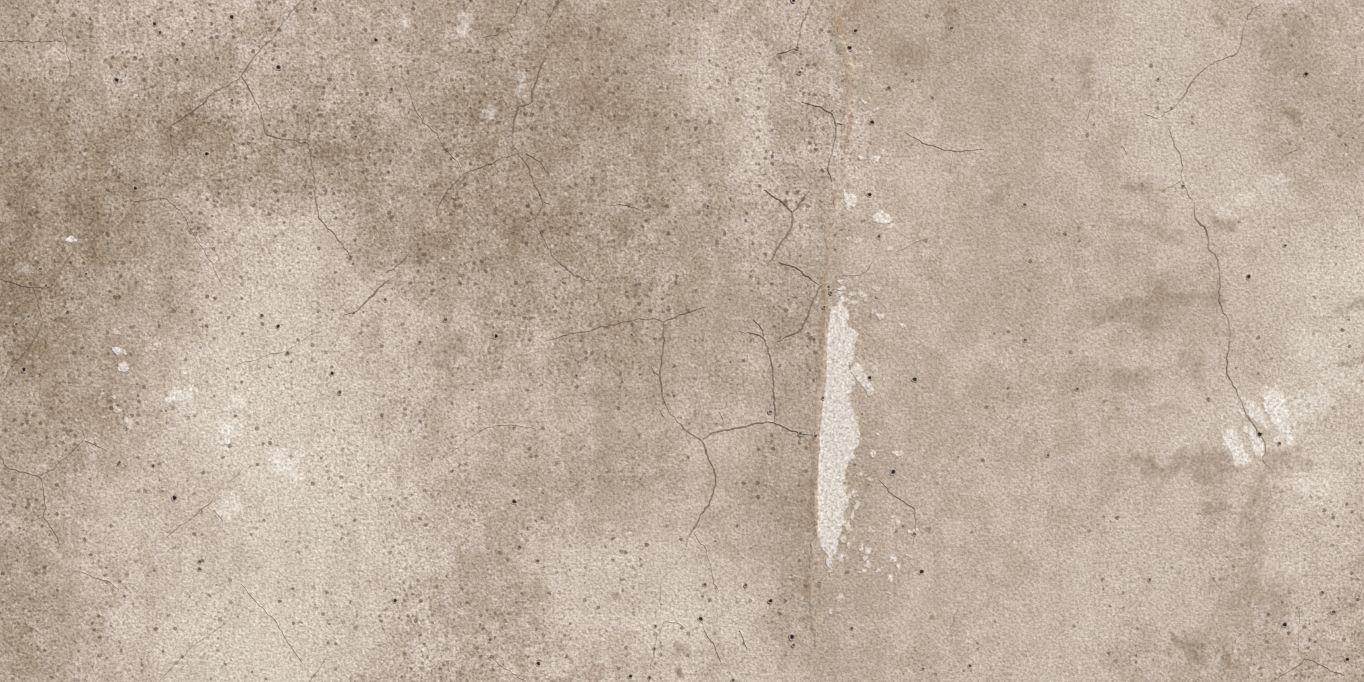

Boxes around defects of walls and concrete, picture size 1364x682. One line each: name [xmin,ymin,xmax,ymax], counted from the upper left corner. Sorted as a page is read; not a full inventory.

crack [551,102,922,672]
crack [777,0,815,54]
flaking render [817,271,911,595]
crack [1146,5,1270,467]